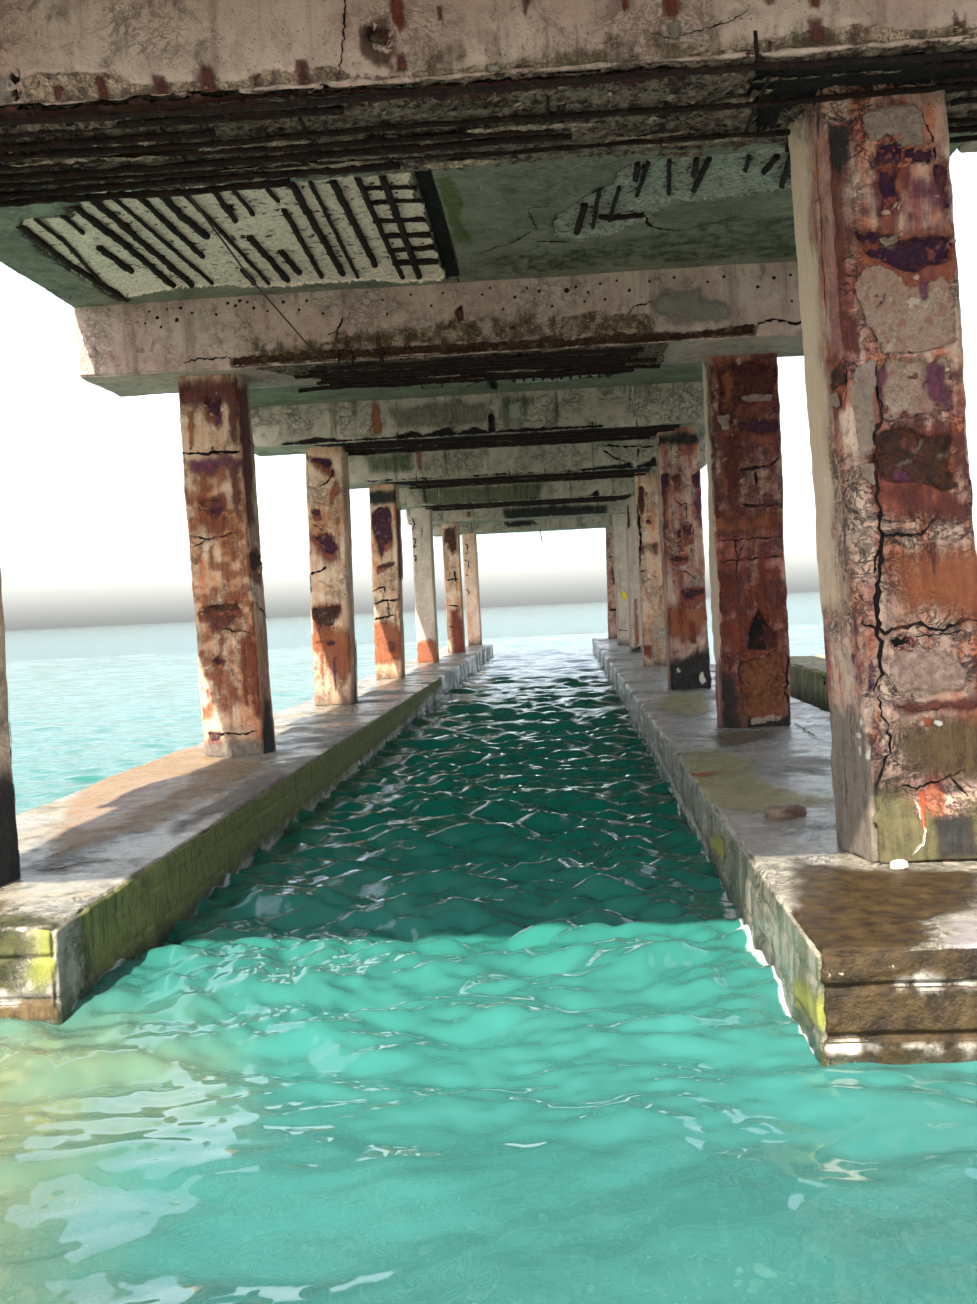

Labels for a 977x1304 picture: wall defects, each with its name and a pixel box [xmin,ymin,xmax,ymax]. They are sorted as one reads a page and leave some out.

spalling [0,18,977,608]
crack [722,151,826,330]
rust [828,124,860,351]
rust [178,377,262,718]
spalling [368,358,781,665]
rust [667,366,789,660]
spalling [739,570,790,725]
crack [784,359,977,846]
rust [893,543,977,620]
leakage [0,724,59,931]
leakage [791,711,977,968]
leakage [826,1039,861,1054]